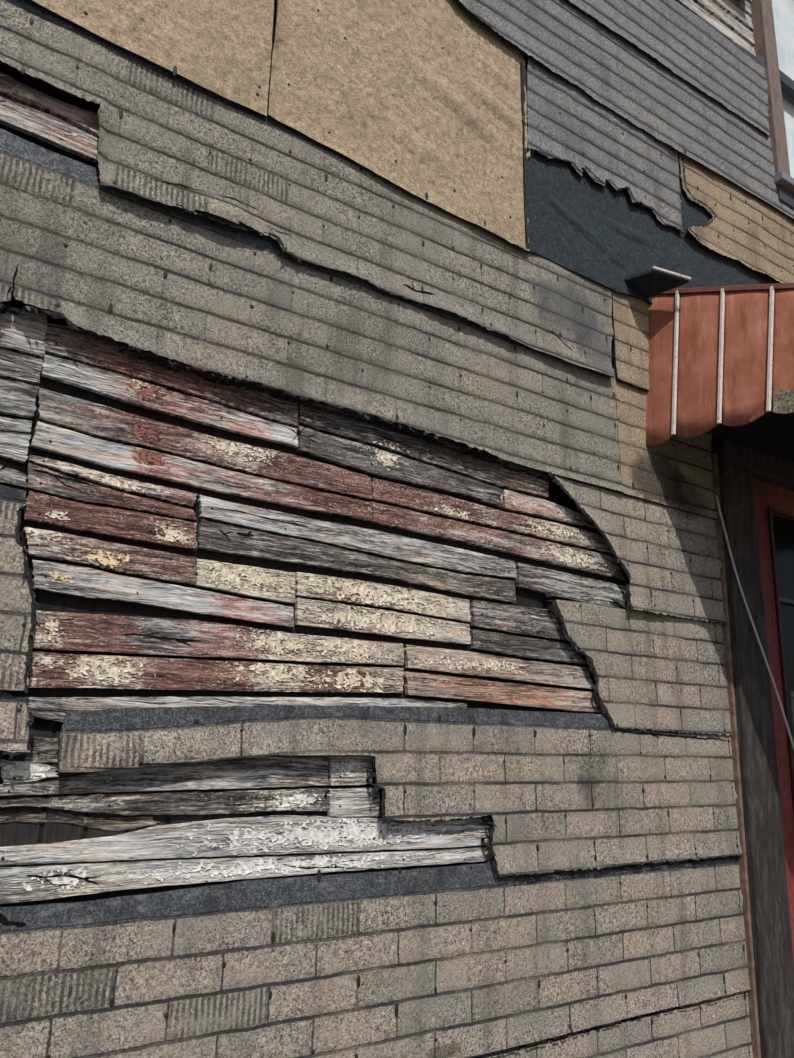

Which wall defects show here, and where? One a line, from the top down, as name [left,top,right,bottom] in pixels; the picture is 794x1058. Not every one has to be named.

crack [6,265,23,307]
peeling [198,437,274,465]
peeling [366,439,409,470]
peeling [79,474,151,493]
peeling [23,510,70,551]
peeling [86,549,129,568]
peeling [152,525,194,545]
peeling [519,516,620,571]
peeling [190,562,463,692]
peeling [26,618,143,685]
peeling [124,801,446,885]
peeling [22,867,91,891]